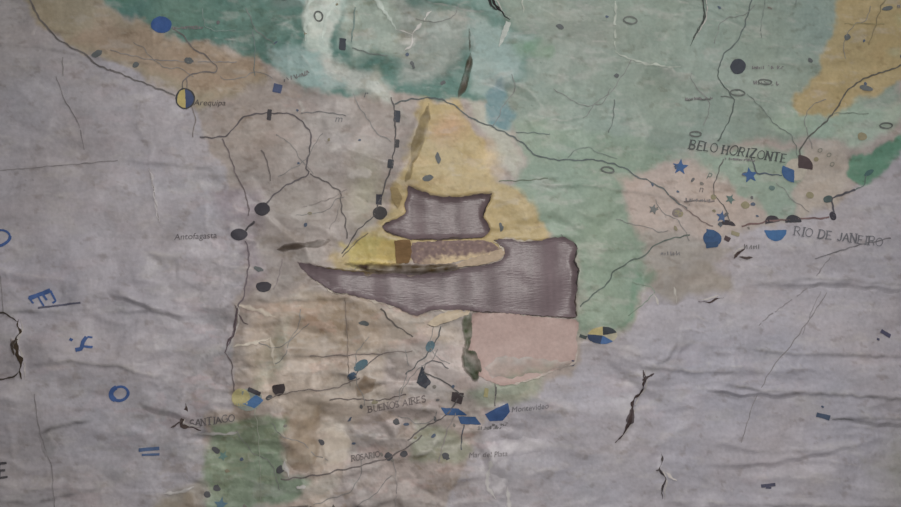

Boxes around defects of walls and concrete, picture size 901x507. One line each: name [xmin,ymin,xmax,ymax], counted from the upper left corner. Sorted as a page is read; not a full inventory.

peeling [298,186,580,386]